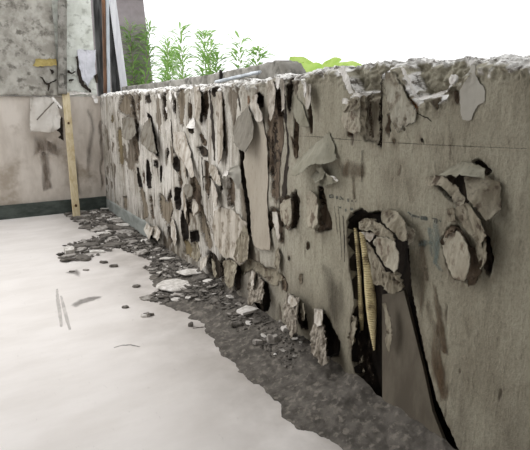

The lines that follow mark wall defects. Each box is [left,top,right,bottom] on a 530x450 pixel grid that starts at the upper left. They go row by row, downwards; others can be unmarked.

crack [36,56,91,120]
peeling [67,49,98,103]
peeling [338,64,486,147]
leakage [38,141,56,187]
peeling [117,77,340,366]
spalling [347,209,459,450]